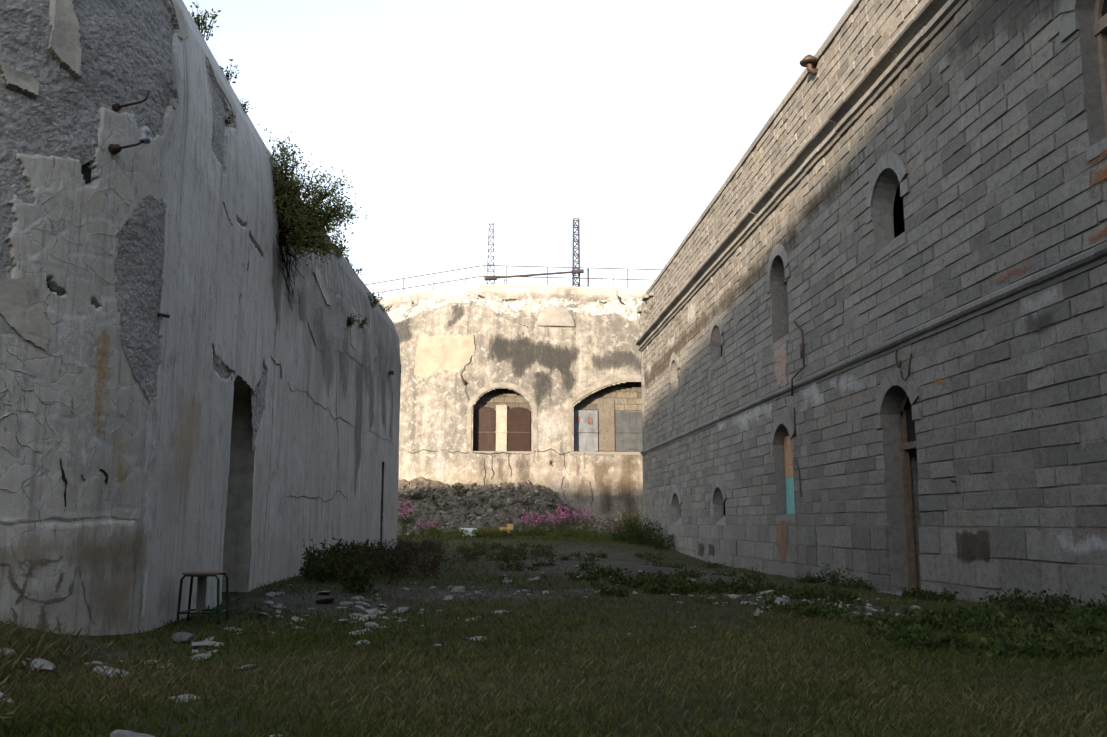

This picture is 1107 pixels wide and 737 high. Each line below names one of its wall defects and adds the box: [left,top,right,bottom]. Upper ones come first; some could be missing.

spalling [0,0,188,351]
crack [0,162,137,525]
spalling [114,194,166,402]
spalling [251,365,266,451]
crack [264,316,640,535]
leakage [490,336,578,404]